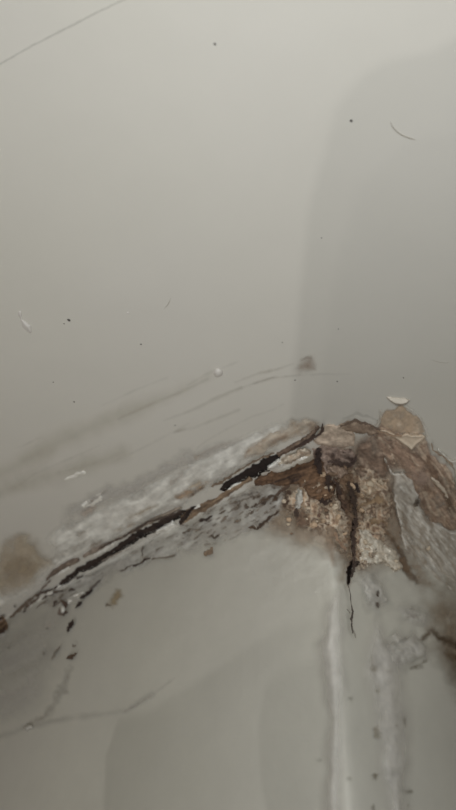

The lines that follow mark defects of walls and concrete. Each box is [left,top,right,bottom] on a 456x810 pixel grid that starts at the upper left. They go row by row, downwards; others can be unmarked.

spalling [0,396,456,634]
crack [332,479,360,634]
leakage [422,604,456,672]